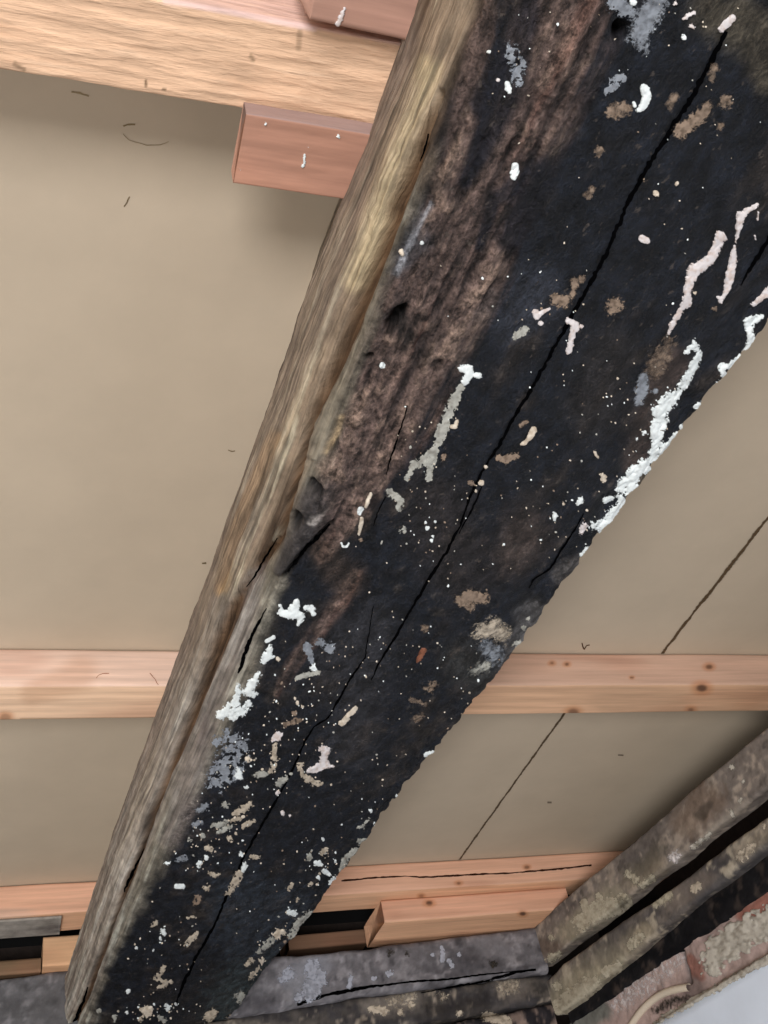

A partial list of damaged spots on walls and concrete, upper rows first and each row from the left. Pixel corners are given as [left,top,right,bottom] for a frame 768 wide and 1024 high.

leakage [404,454,446,482]
leakage [357,492,373,542]
crack [176,31,728,1006]
crack [661,517,768,654]
leakage [314,638,336,654]
leakage [294,663,321,681]
leakage [268,743,279,774]
leakage [239,851,261,873]
leakage [430,945,461,969]
leakage [651,996,689,1014]